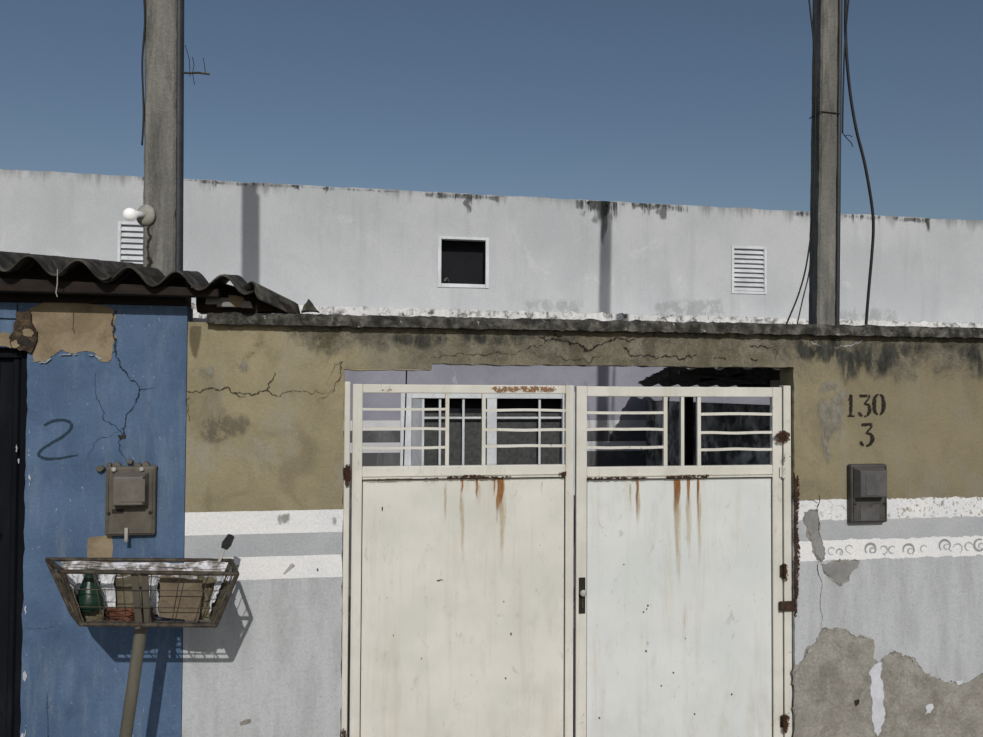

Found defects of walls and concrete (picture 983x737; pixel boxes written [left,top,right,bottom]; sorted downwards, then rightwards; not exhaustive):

water stain [577,200,617,239]
flaking render [0,302,117,363]
crack [88,310,151,461]
crack [186,361,343,421]
crack [433,333,726,363]
water stain [797,339,920,378]
rust [775,430,790,443]
rust [666,474,709,516]
rust [784,473,800,617]
flaking render [803,509,860,586]
flaking render [792,627,983,737]